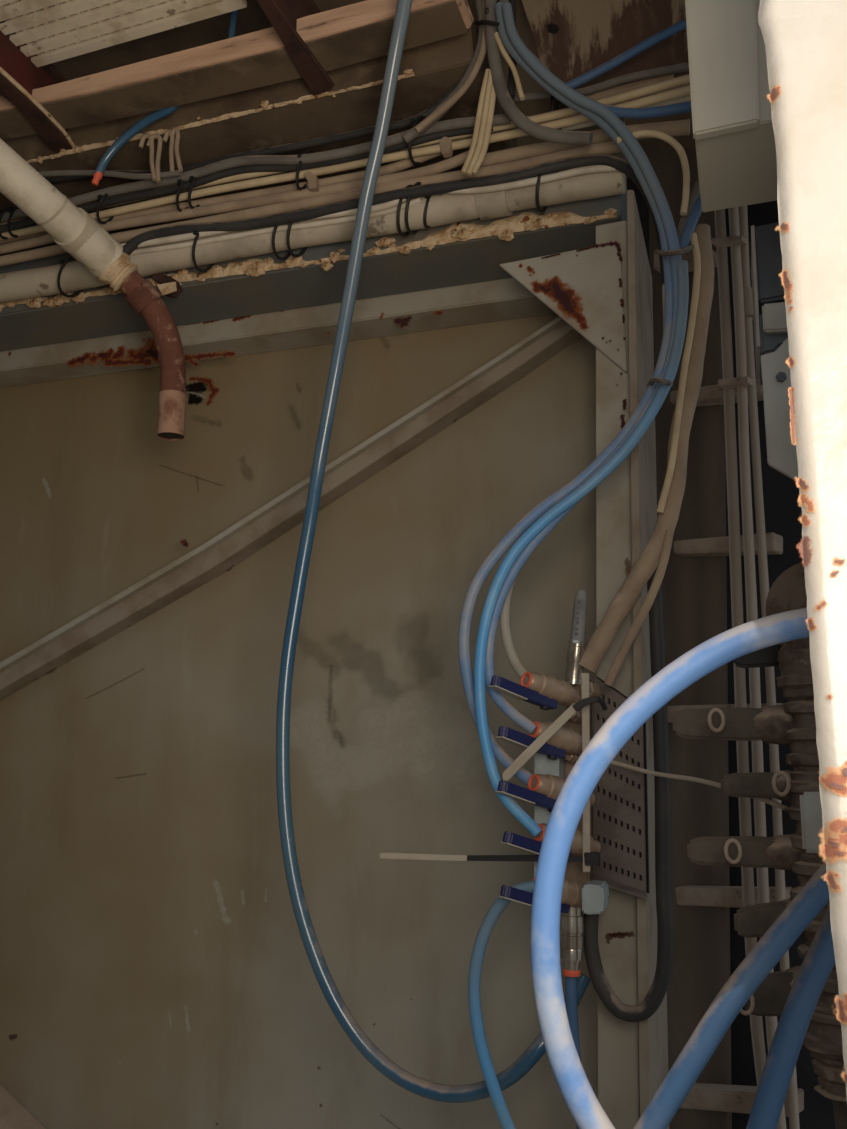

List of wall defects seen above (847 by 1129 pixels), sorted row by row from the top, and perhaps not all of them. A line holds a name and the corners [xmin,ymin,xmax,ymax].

rust [363,208,617,257]
rust [0,285,122,312]
rust [147,248,349,298]
rust [519,264,588,330]
rust [67,338,159,367]
rust [184,350,236,406]
rust [796,478,815,566]
rust [830,557,845,577]
rust [806,600,827,631]
rust [820,761,847,797]
rust [820,818,847,892]